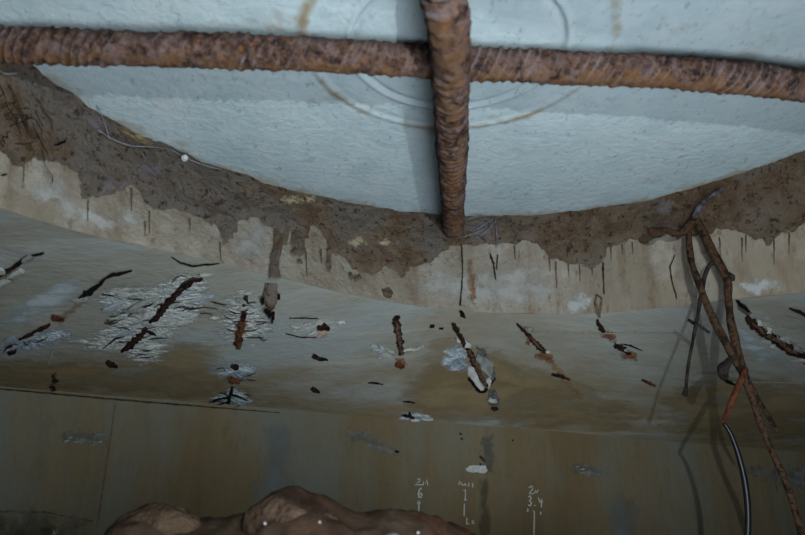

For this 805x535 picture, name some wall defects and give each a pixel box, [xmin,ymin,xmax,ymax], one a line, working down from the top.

spalling [0,270,277,369]
spalling [287,317,347,338]
spalling [209,361,258,407]